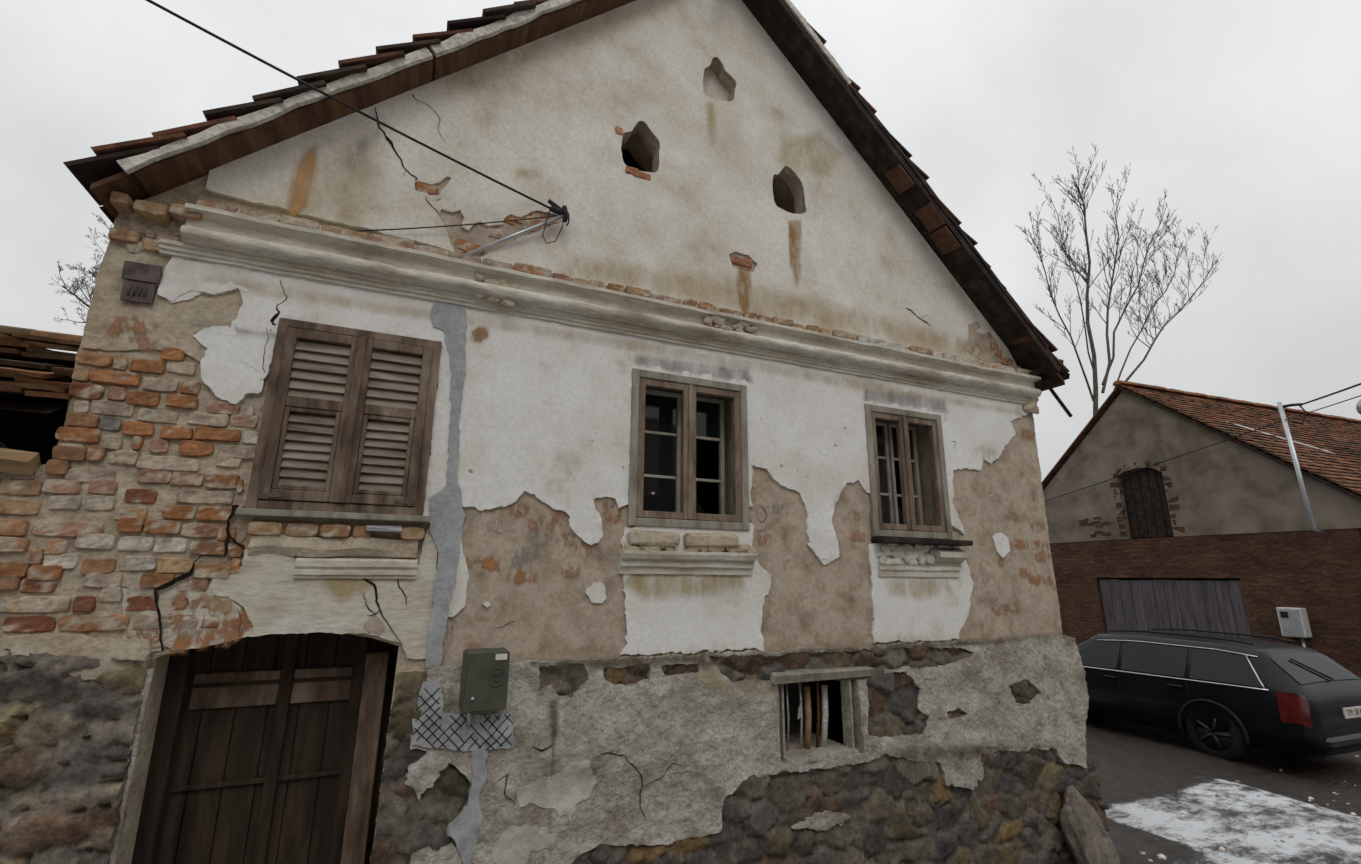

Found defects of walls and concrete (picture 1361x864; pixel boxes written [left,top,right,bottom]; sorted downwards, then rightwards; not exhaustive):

damp [291,150,315,216]
crack [375,107,440,216]
flaking render [415,178,563,257]
flaking render [963,321,1021,369]
flaking render [0,227,324,656]
flaking render [1078,461,1185,537]
crack [122,505,245,651]
crack [363,538,407,646]
flaking render [442,402,1063,738]
spalling [369,670,470,864]
spalling [571,748,1109,864]